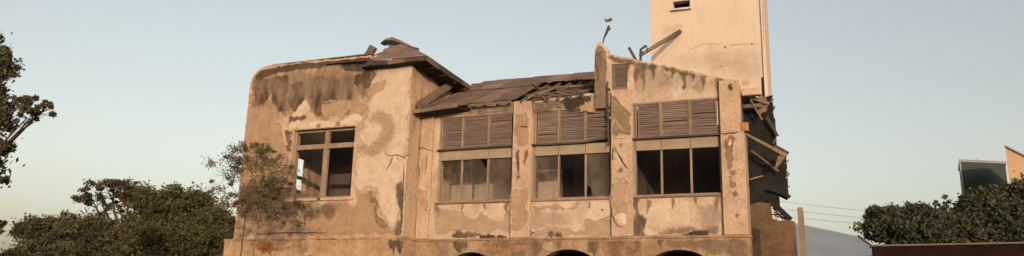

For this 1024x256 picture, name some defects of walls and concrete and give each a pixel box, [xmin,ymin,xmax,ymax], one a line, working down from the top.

leakage [252,57,377,115]
leakage [595,55,724,90]
peeling [236,65,425,237]
leakage [389,182,403,253]
crack [386,148,432,221]
peeling [433,177,711,256]